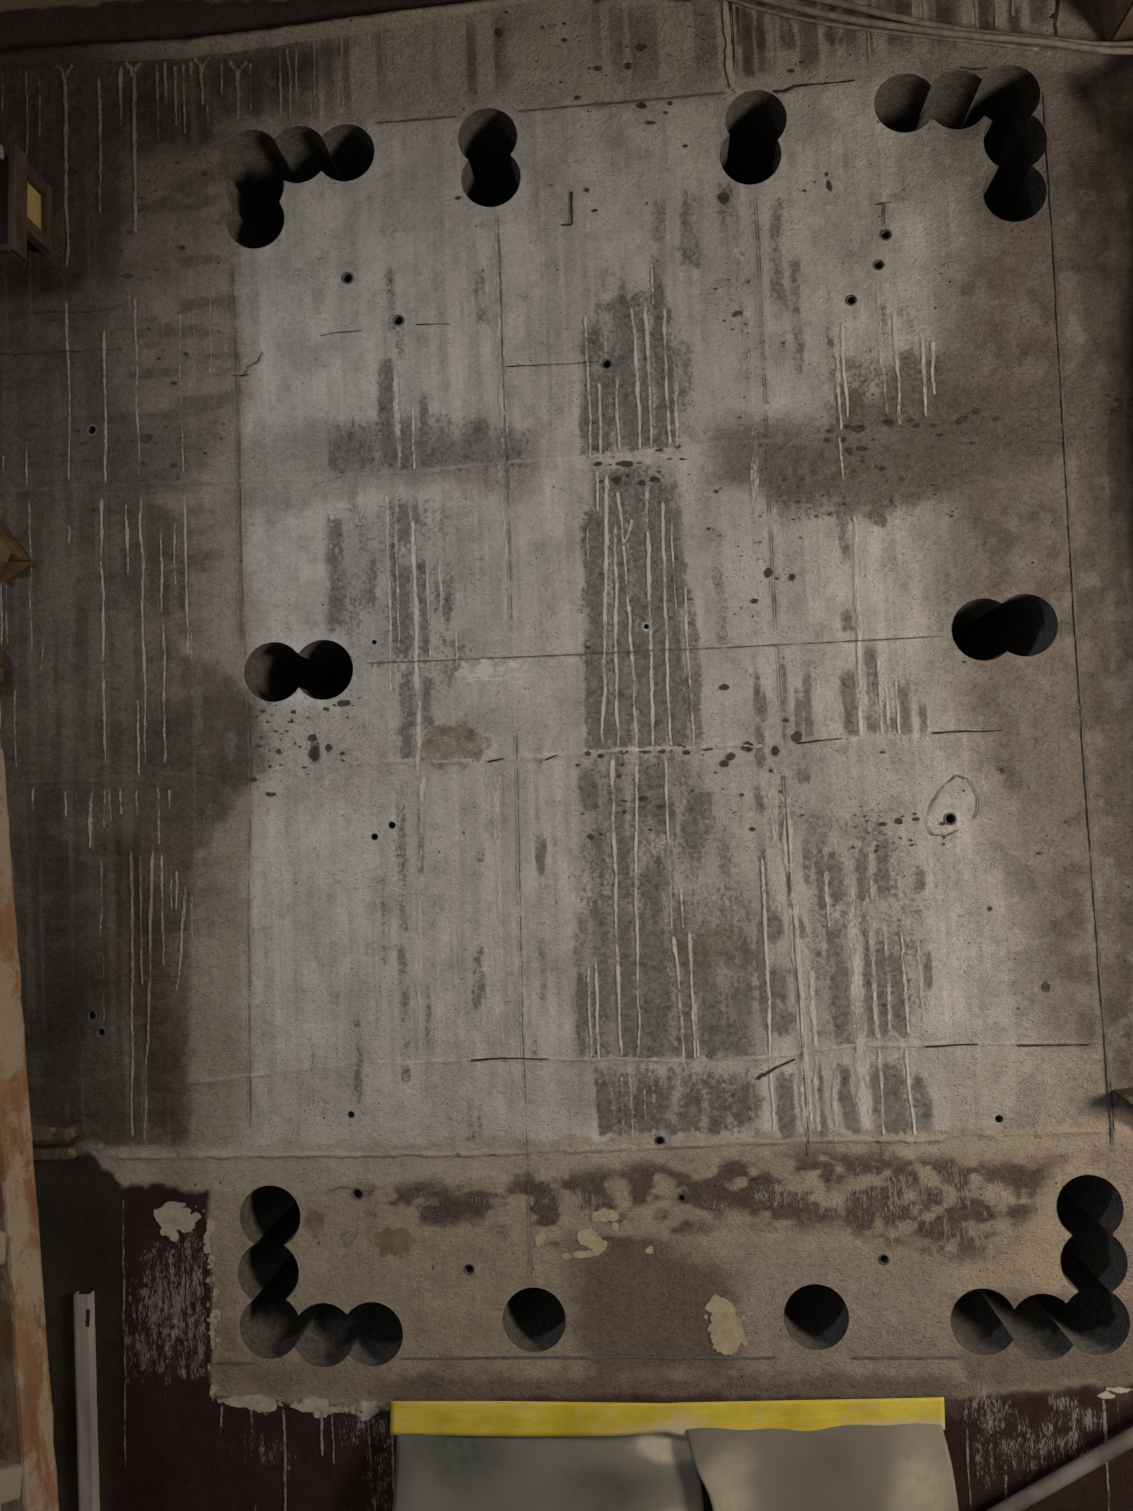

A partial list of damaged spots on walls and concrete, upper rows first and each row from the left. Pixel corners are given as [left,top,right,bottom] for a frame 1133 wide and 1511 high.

leakage [740,14,795,75]
leakage [99,331,107,762]
leakage [88,496,192,848]
leakage [0,43,316,478]
leakage [329,243,530,560]
leakage [574,248,965,1139]
leakage [770,198,805,372]
leakage [129,790,194,1139]
peeling [154,1201,379,1421]
peeling [561,1208,620,1260]
flaking render [704,1294,748,1357]